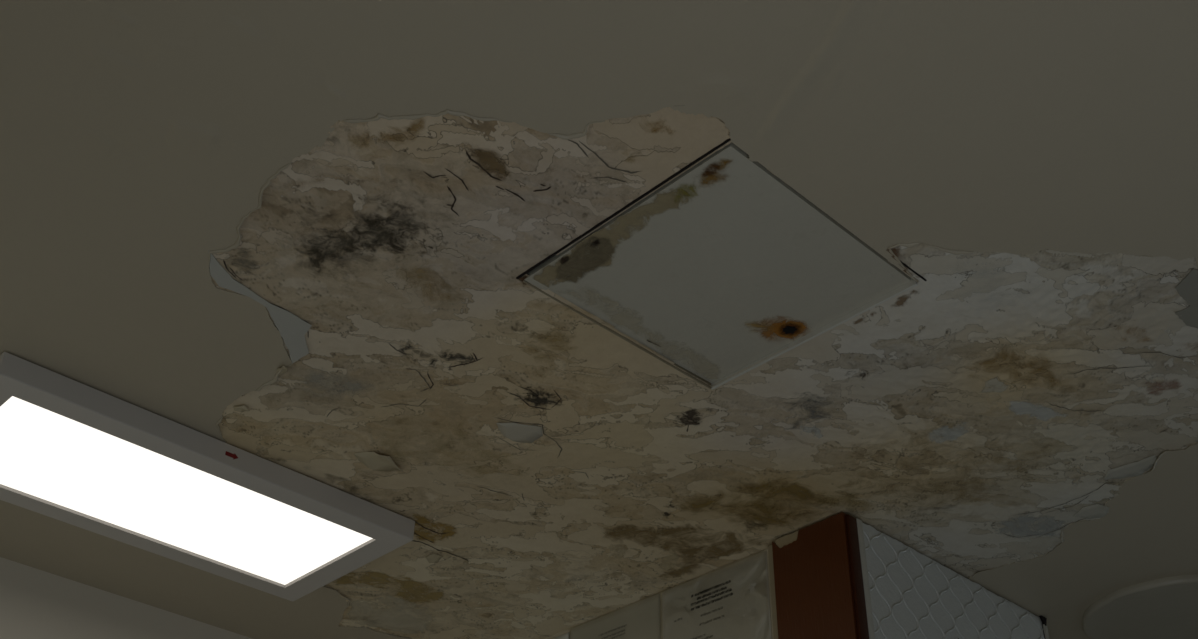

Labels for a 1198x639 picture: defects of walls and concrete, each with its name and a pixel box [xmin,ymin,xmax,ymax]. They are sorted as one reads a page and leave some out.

water stain [307,203,417,266]
peeling [208,105,1198,639]
corrosion [747,319,807,339]
water stain [607,481,825,576]